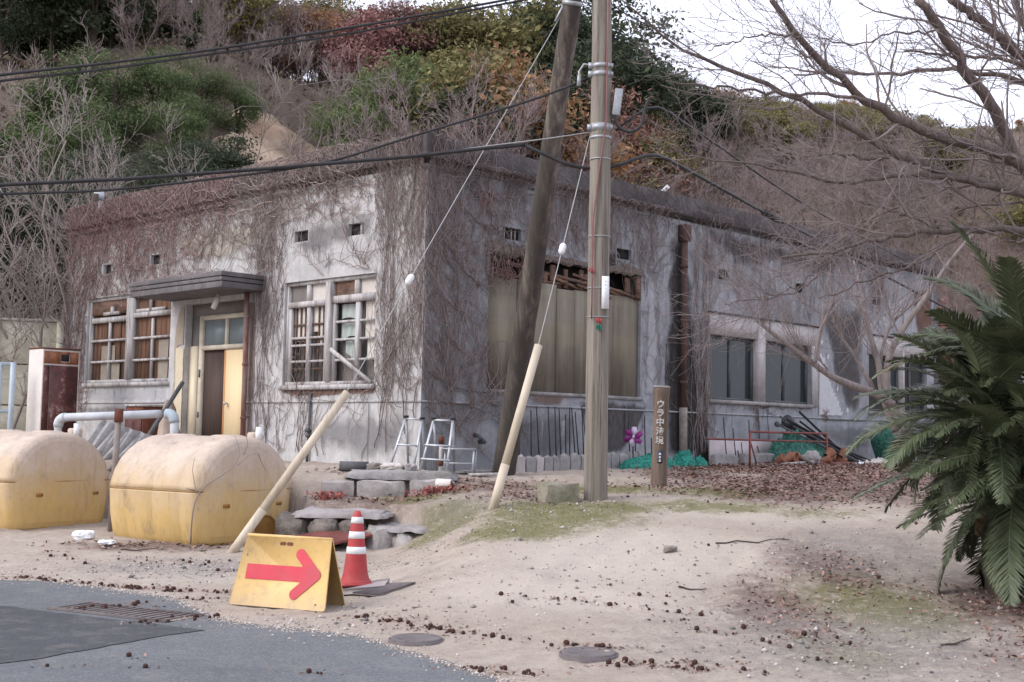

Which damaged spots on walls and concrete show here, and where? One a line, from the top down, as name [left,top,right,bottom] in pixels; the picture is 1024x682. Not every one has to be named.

water stain [715,235,838,273]